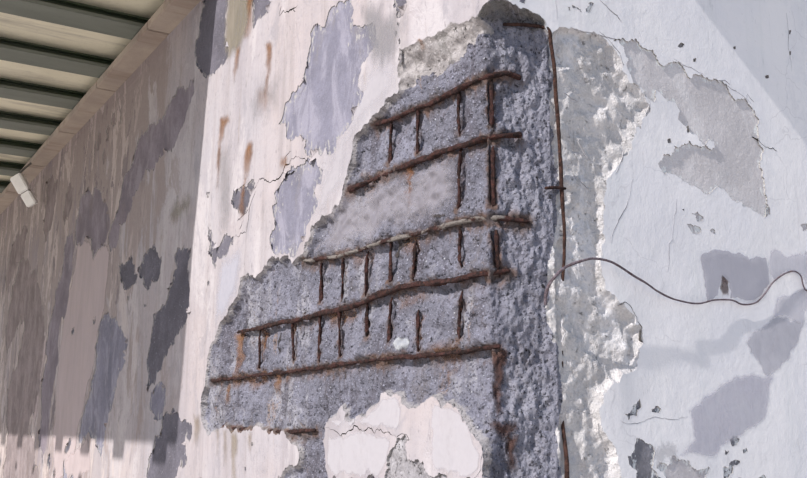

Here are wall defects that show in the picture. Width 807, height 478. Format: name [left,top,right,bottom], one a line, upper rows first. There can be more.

crack [237,153,309,236]
peeling [2,0,229,478]
spalling [146,0,770,478]
corrosion [492,351,507,411]
crack [325,425,409,439]